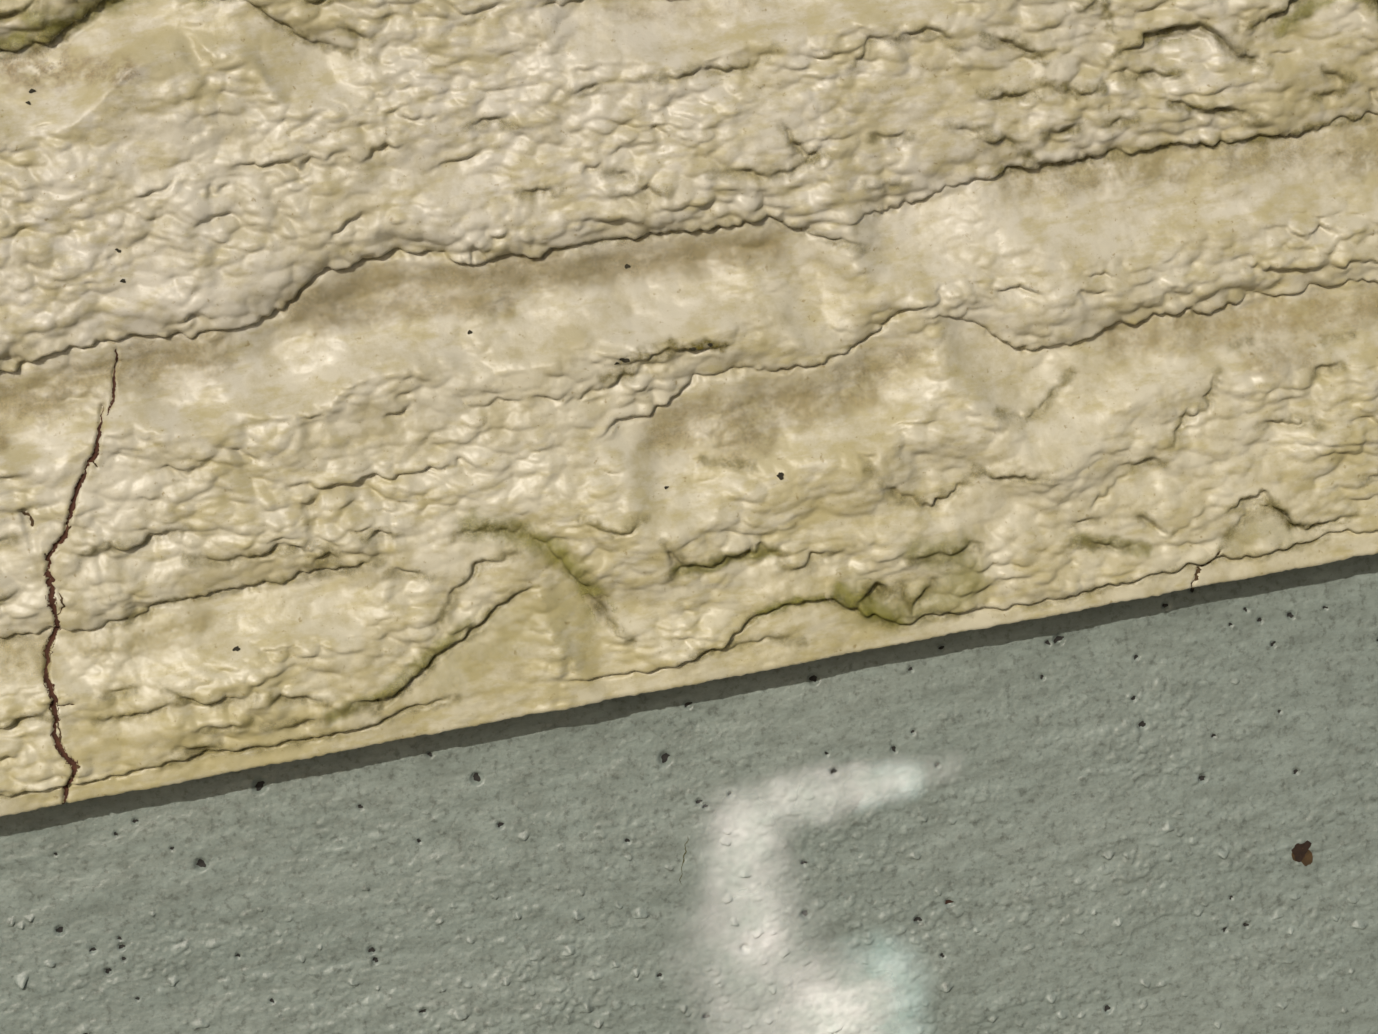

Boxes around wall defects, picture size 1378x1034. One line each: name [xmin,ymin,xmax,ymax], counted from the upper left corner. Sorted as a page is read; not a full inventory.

crack [21,349,118,804]
corrosion [1291,840,1313,866]